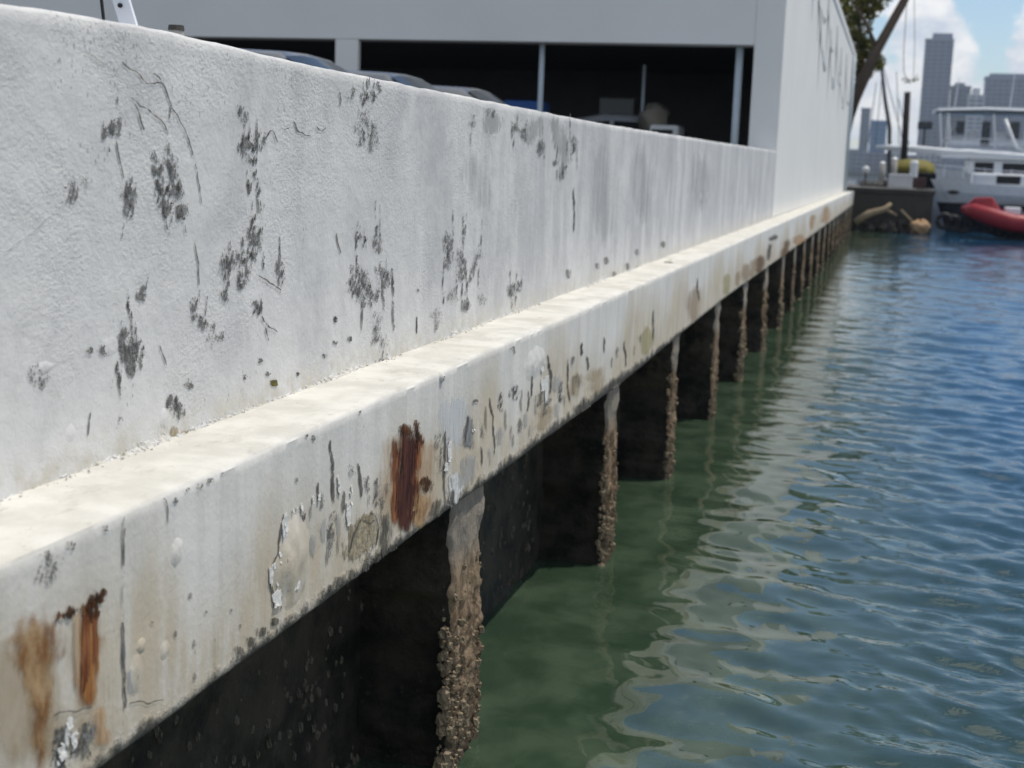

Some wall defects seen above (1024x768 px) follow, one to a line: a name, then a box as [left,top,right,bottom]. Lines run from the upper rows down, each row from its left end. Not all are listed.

crack [122,61,202,203]
rust [386,420,434,532]
spalling [235,441,397,654]
rust [14,588,109,764]
spalling [50,707,97,768]